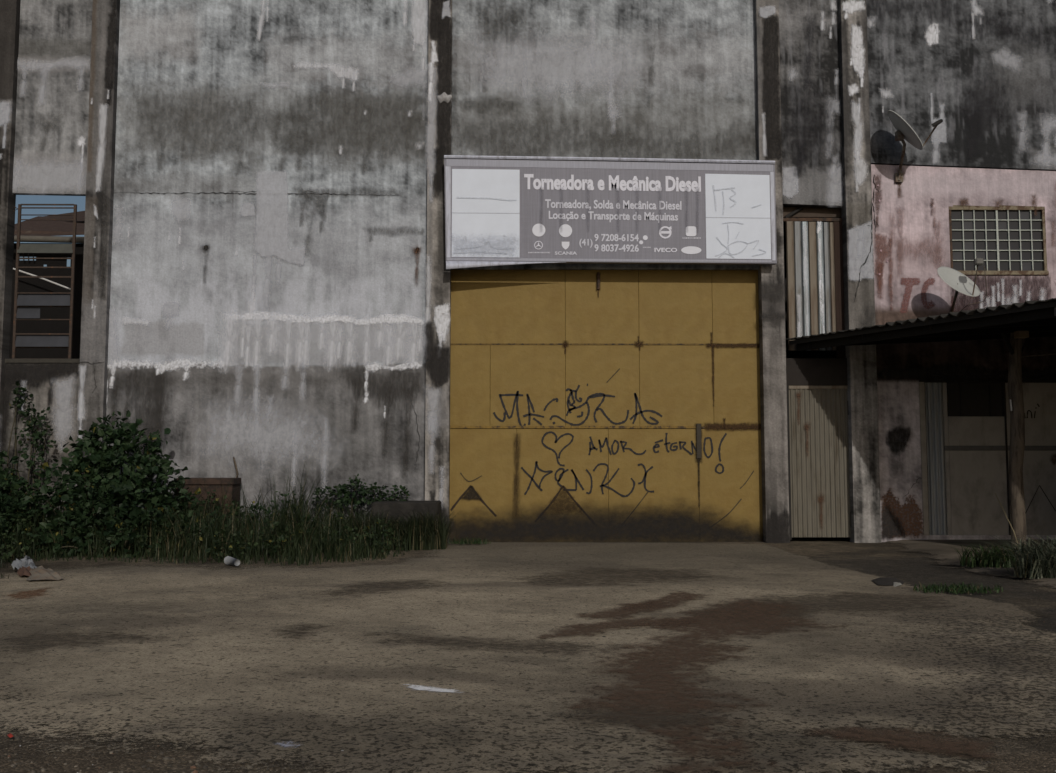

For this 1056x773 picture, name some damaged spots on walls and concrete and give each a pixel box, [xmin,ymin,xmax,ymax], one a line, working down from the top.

peeling [843,0,893,309]
peeling [831,165,842,202]
flaking render [881,488,924,538]